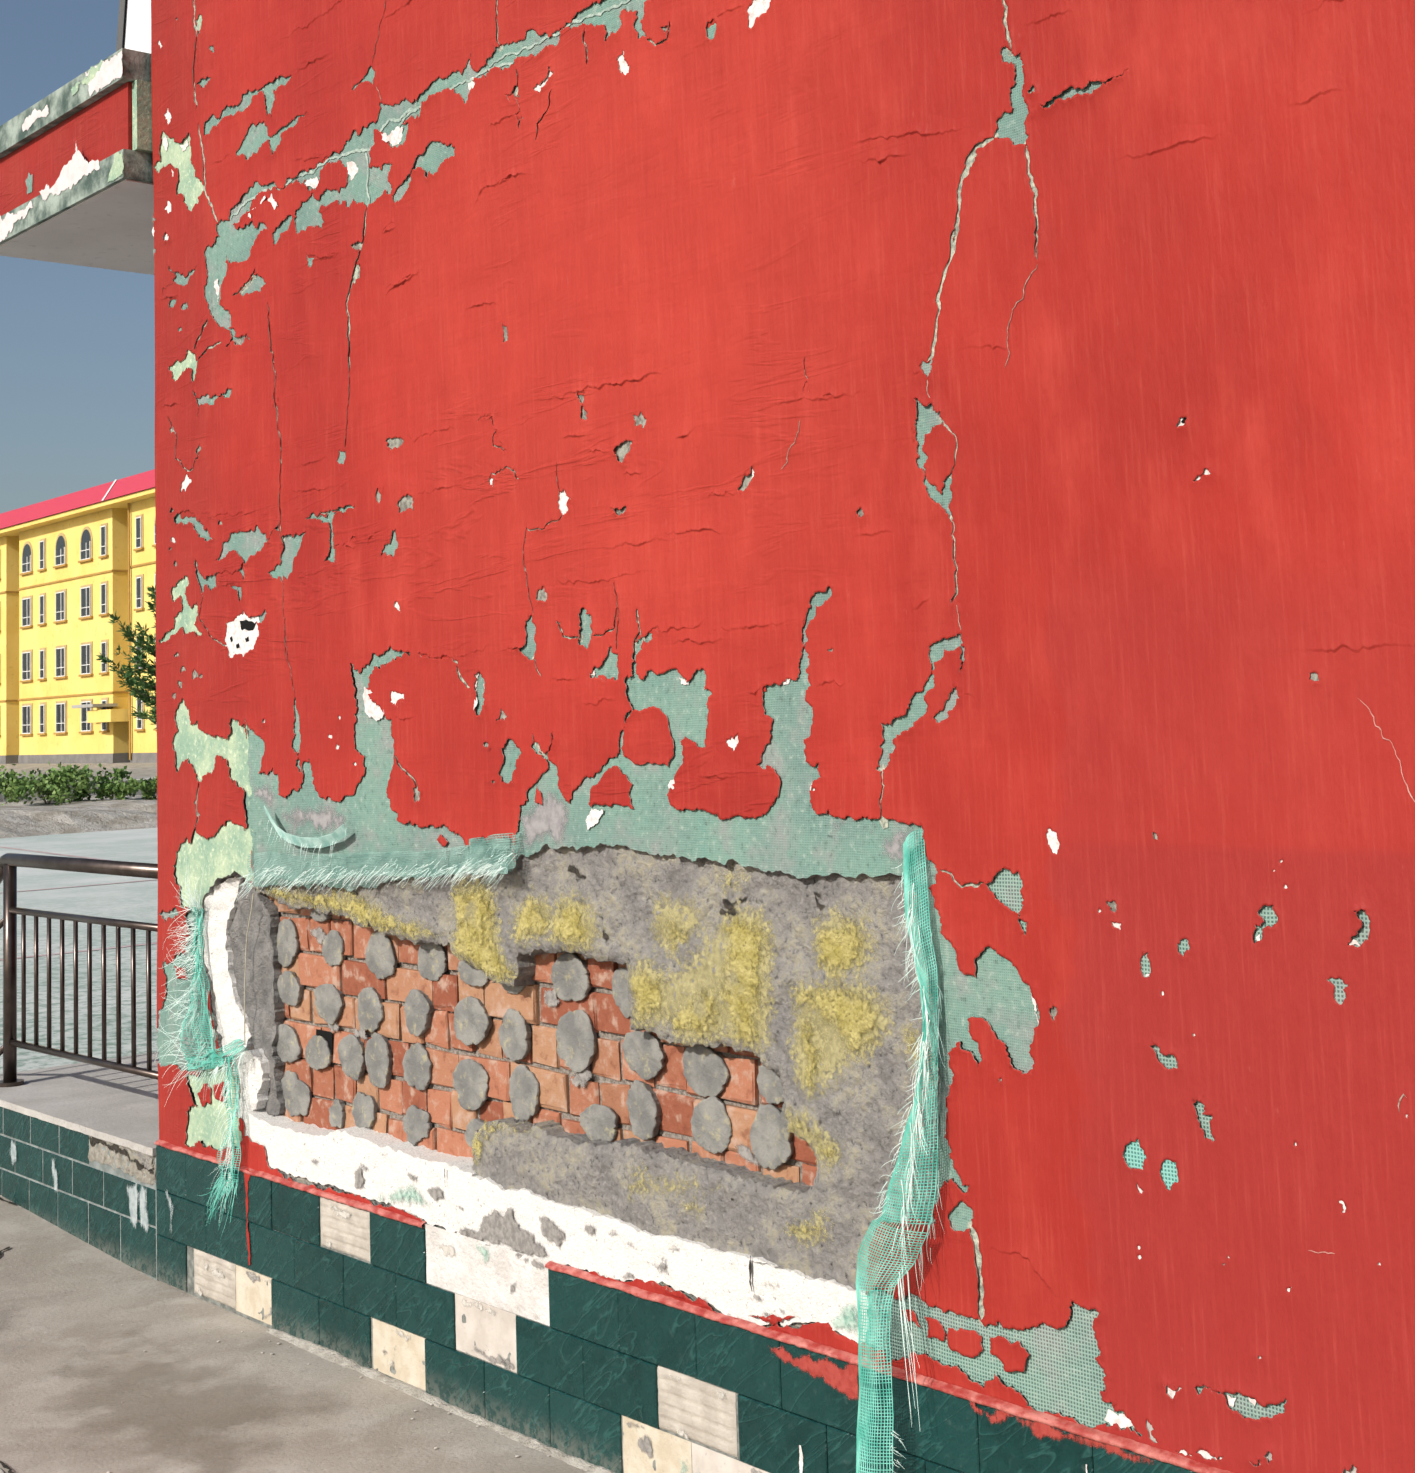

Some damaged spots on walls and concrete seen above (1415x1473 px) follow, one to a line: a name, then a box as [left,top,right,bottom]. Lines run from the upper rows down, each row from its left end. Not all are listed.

peeling [748,0,771,28]
peeling [71,50,123,96]
peeling [22,105,49,132]
peeling [0,146,124,242]
peeling [152,0,648,381]
crack [915,0,1122,601]
crack [1360,700,1415,802]
peeling [1253,905,1278,943]
peeling [1348,909,1370,947]
peeling [157,479,1157,1443]
peeling [1328,978,1348,1004]
peeling [1151,1045,1177,1069]